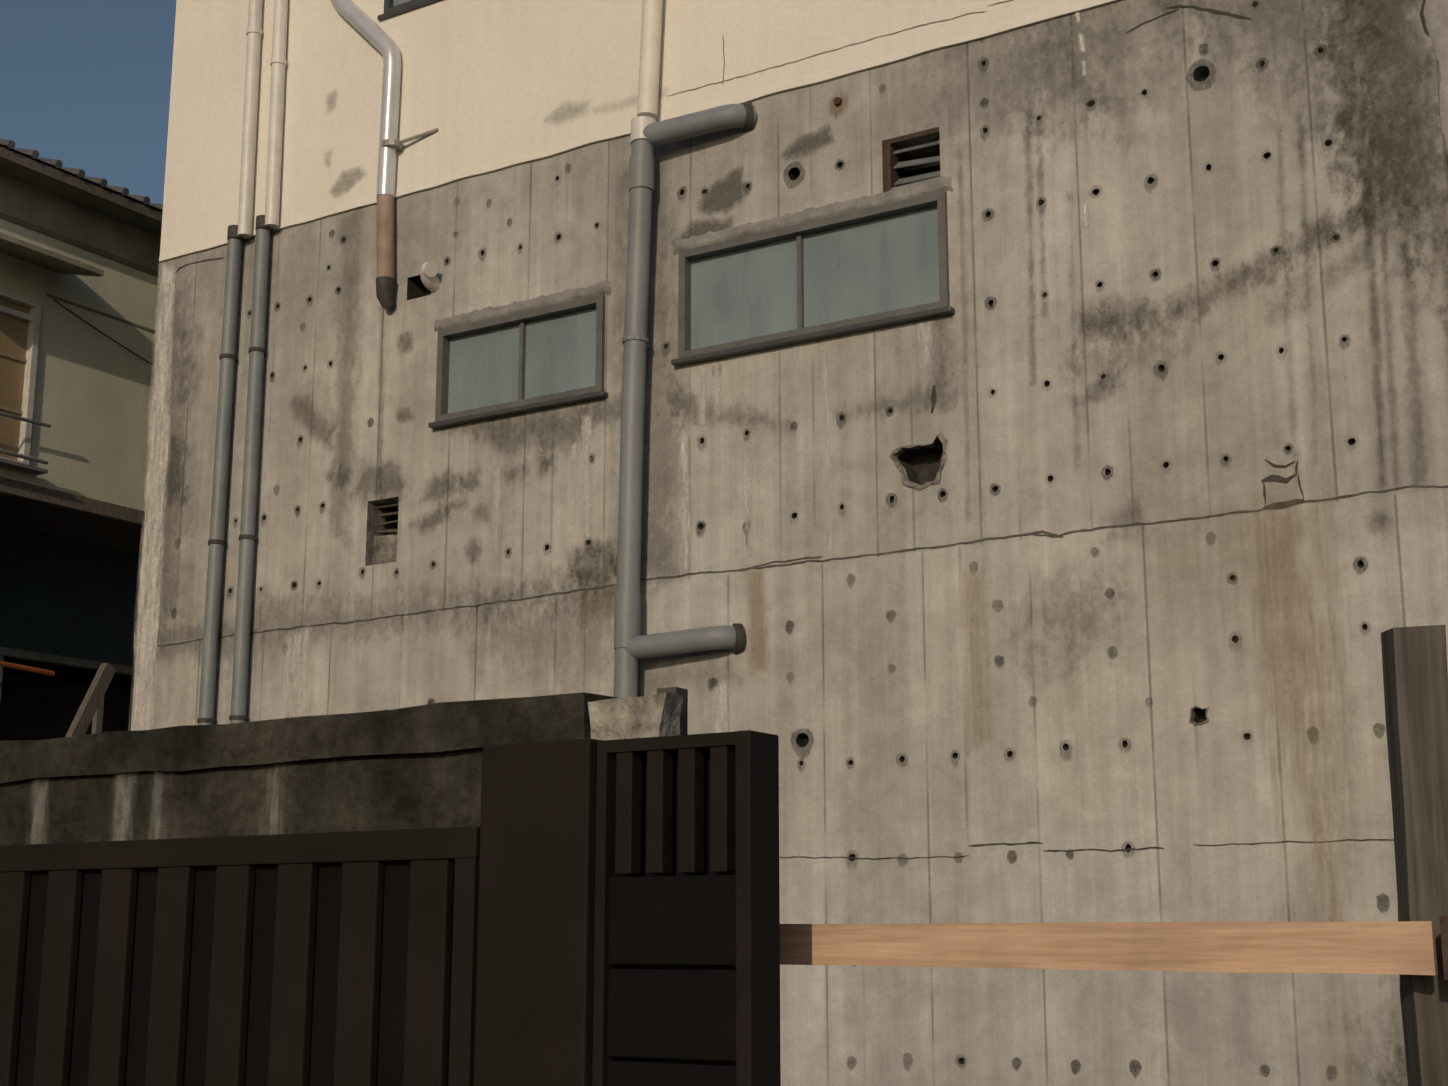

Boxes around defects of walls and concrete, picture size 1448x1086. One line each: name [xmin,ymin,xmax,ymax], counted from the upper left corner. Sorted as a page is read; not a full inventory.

crack [669,0,1012,96]
crack [1125,5,1252,34]
peeling [1420,0,1429,36]
water stain [1314,0,1448,251]
water stain [492,406,616,580]
spalling [890,432,949,491]
crack [135,459,1448,648]